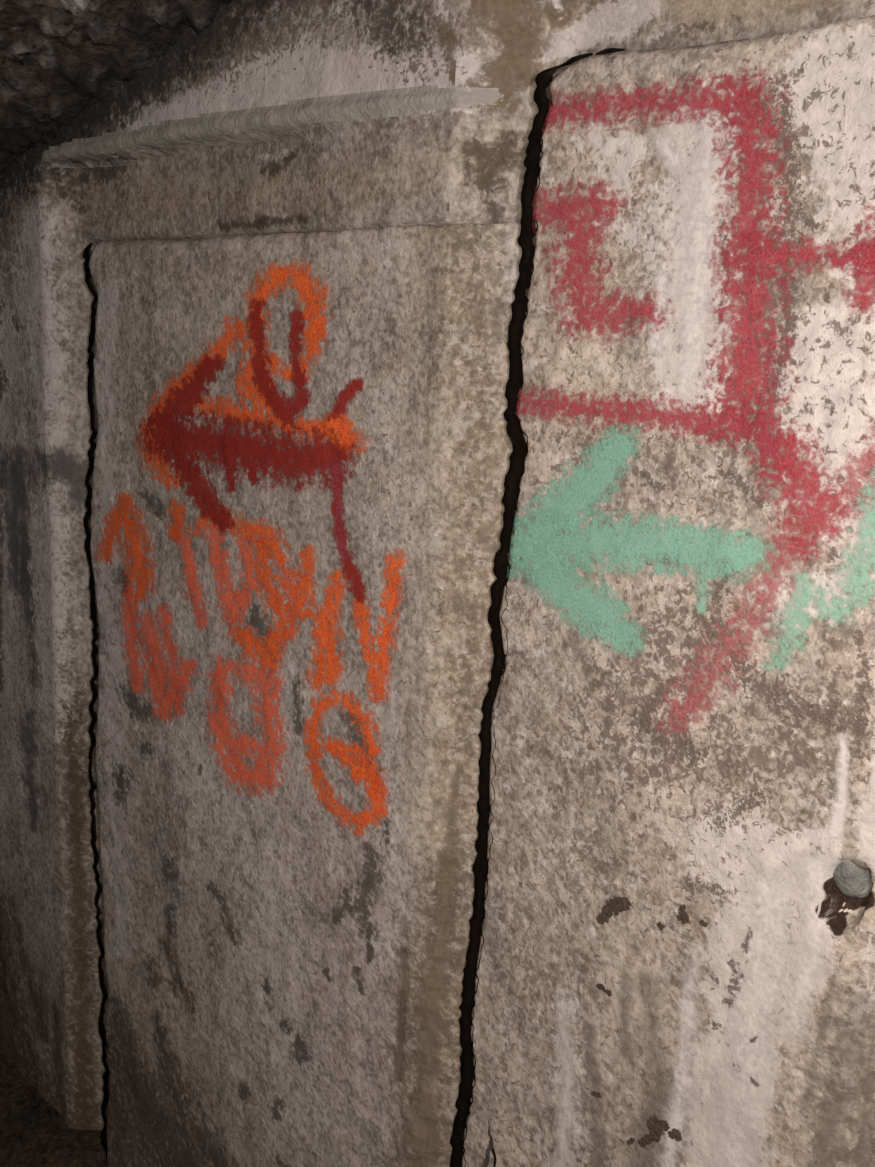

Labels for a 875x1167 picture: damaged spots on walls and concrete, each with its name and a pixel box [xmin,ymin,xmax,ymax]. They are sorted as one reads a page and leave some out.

crack [83,242,110,1167]
crack [450,48,625,1167]
water stain [829,734,850,838]
water stain [554,999,574,1167]
water stain [643,945,700,1167]
water stain [718,855,826,1167]